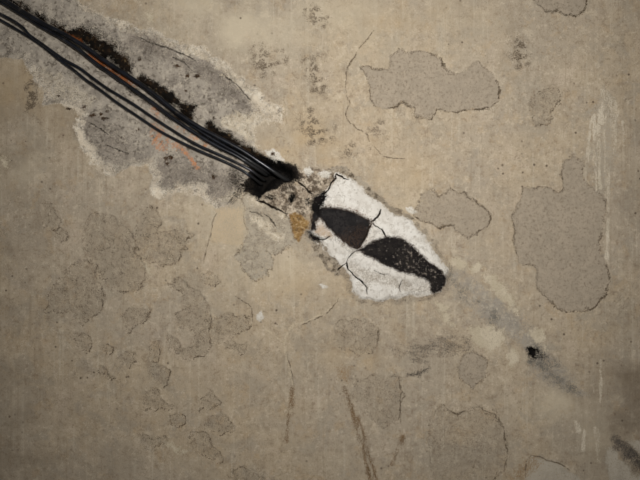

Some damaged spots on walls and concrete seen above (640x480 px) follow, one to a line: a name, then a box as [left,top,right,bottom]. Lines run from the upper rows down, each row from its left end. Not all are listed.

crack [303,30,405,159]
spalling [0,0,521,329]
crack [249,200,287,226]
crack [294,173,348,195]
crack [337,209,386,293]